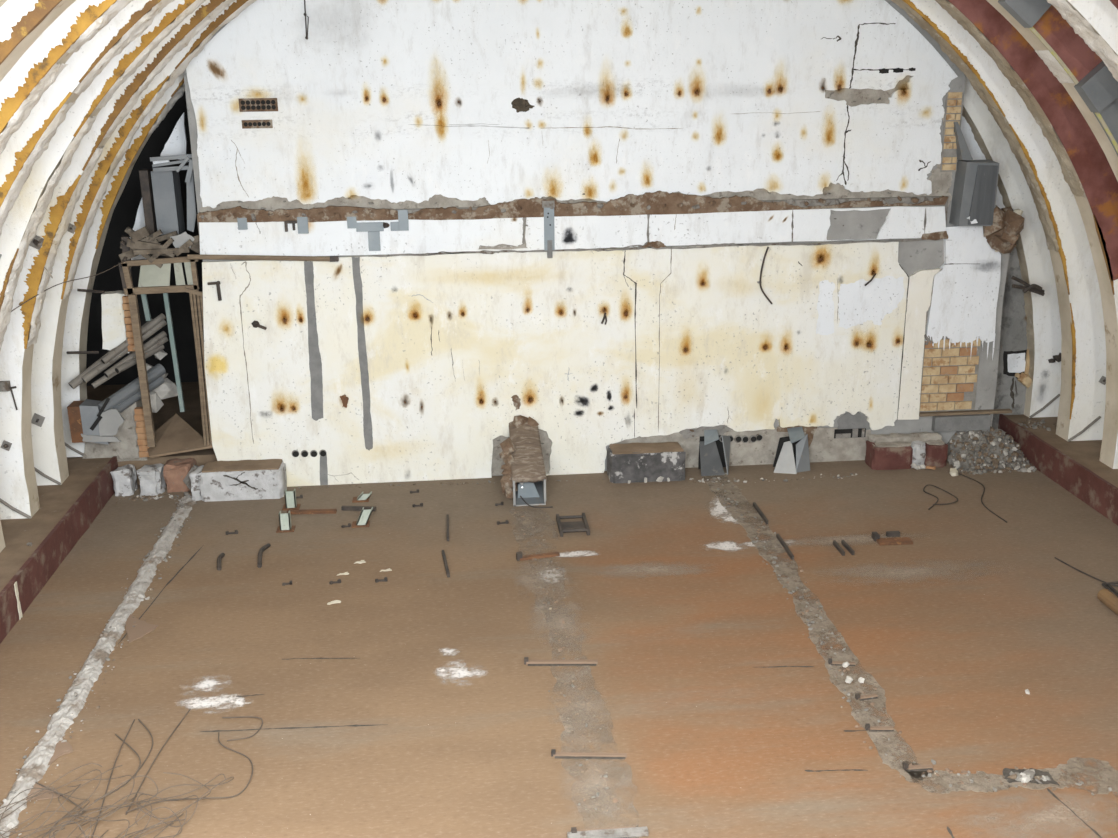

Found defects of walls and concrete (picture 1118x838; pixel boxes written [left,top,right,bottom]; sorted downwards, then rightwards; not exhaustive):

spalling [199,194,505,212]
rust [197,191,948,222]
spalling [541,193,615,204]
spalling [669,92,963,241]
crack [822,23,909,185]
peeling [898,0,1076,419]
spalling [837,412,871,430]
flaking render [911,336,981,470]